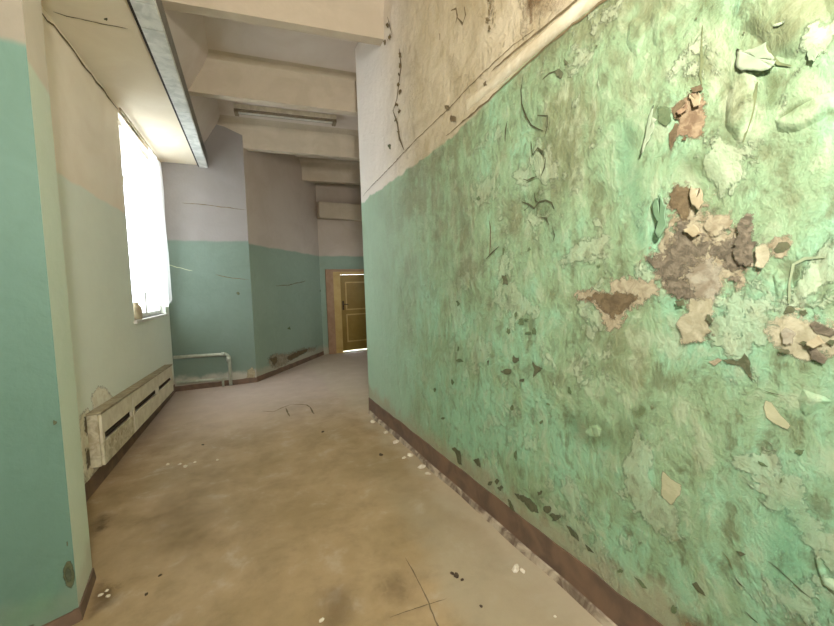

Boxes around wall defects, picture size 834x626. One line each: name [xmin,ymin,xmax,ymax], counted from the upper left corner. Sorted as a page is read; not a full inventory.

crack [42,12,141,139]
flaking render [641,84,707,154]
flaking render [574,184,793,344]
flaking render [764,306,834,364]
flaking render [79,386,112,482]
peeling [764,391,790,429]
spalling [508,491,561,521]
peeling [661,472,682,505]